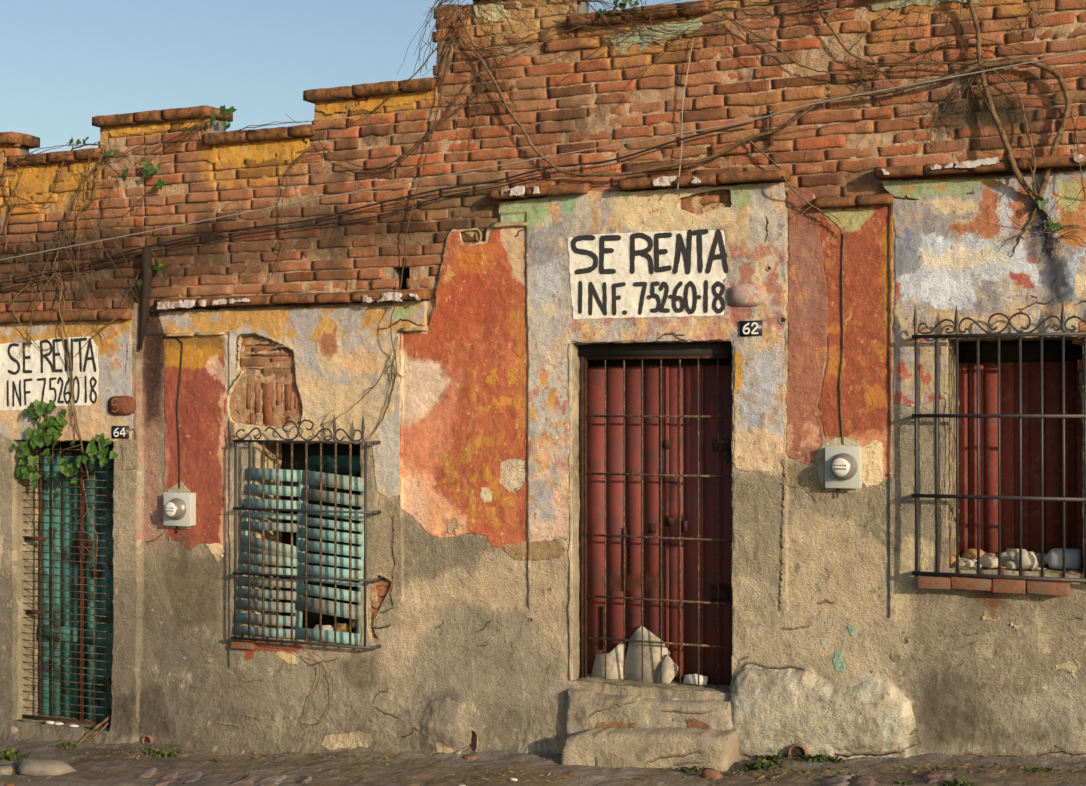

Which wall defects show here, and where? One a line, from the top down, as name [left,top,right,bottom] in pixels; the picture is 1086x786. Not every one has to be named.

peeling [157,154,1086,563]
spalling [366,573,394,645]
crack [234,657,367,689]
crack [371,686,419,738]